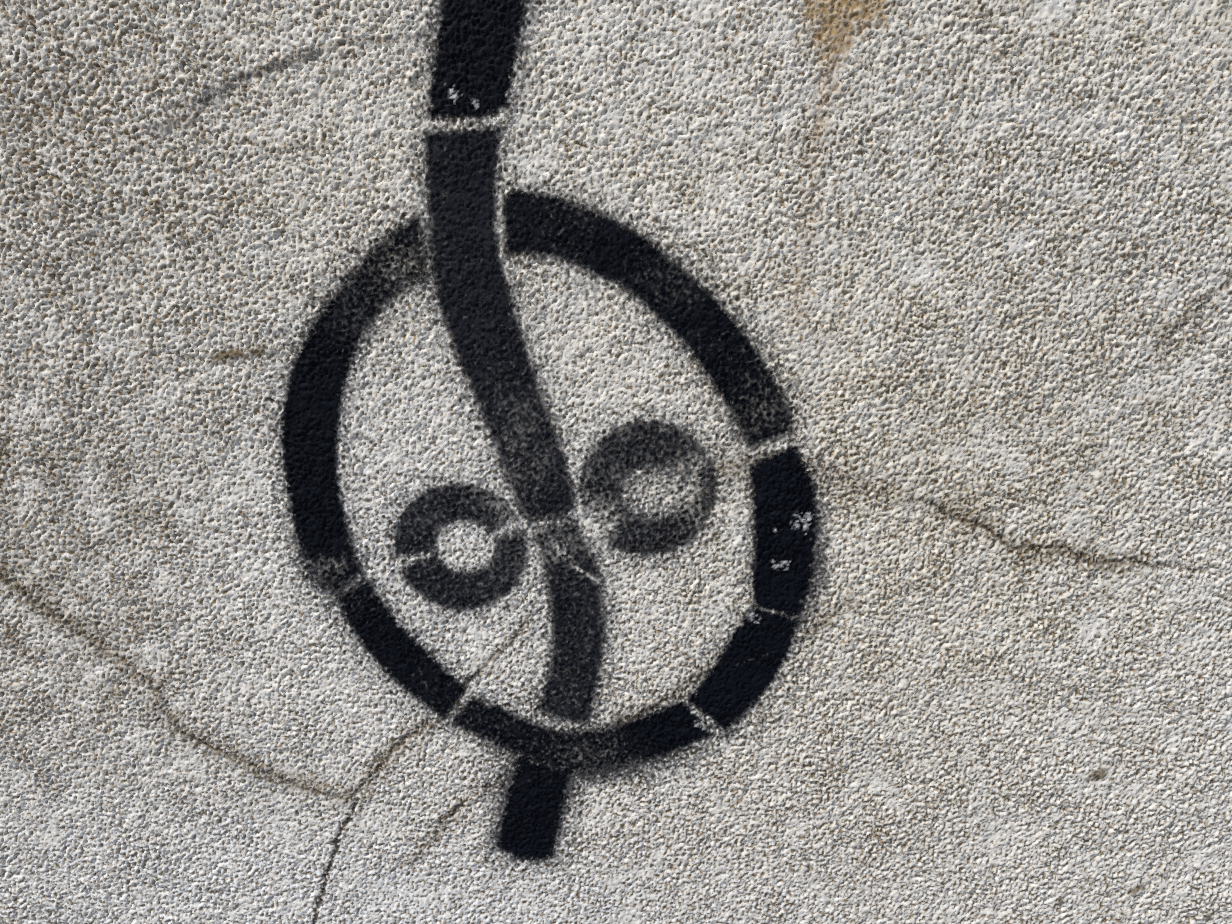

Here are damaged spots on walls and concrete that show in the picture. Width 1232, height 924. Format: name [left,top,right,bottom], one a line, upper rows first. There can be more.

corrosion [804,0,885,51]
crack [912,500,1197,570]
crack [8,576,159,692]
crack [172,716,432,924]
crack [438,801,465,825]